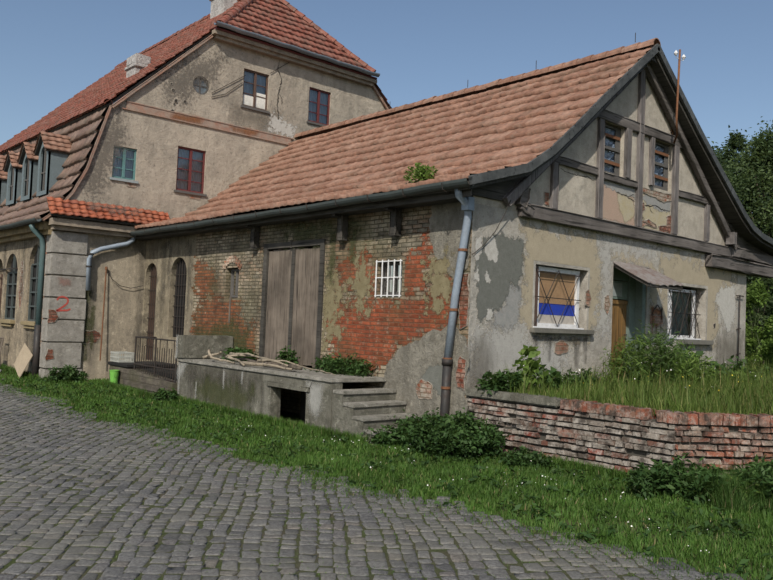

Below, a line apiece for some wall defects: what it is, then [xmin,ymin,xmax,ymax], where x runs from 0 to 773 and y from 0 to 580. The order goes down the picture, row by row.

crack [276,60,284,120]
flaking render [233,112,297,141]
peeling [603,180,672,234]
flaking render [189,228,269,360]
peeling [321,202,738,420]